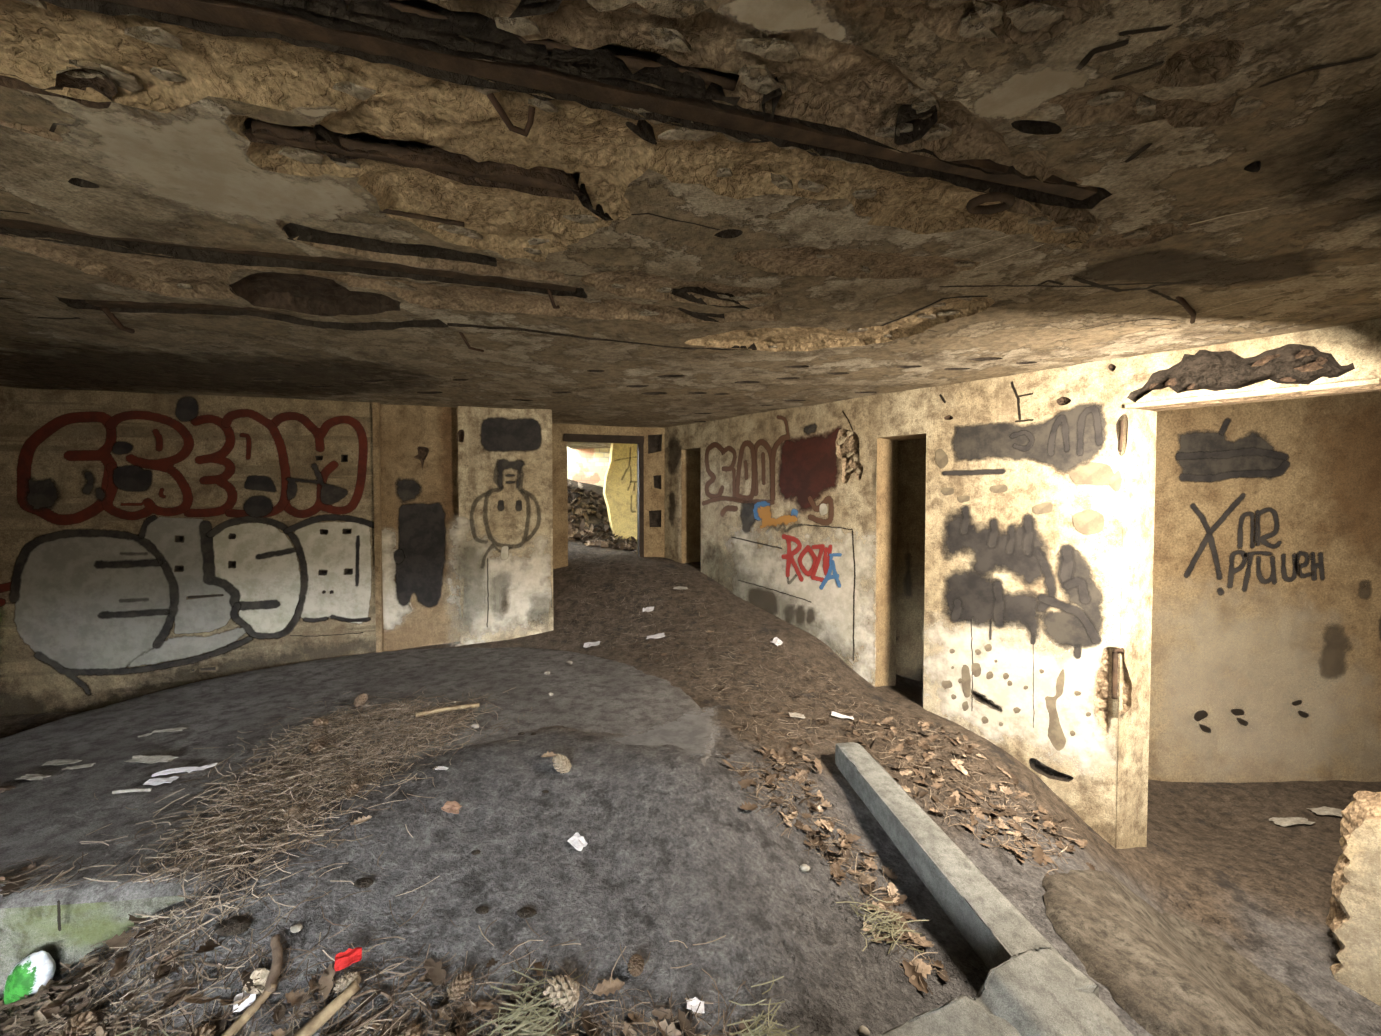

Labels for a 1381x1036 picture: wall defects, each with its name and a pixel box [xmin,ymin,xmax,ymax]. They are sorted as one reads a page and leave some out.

spalling [0,0,1272,380]
spalling [627,375,759,395]
peeling [1359,581,1371,599]